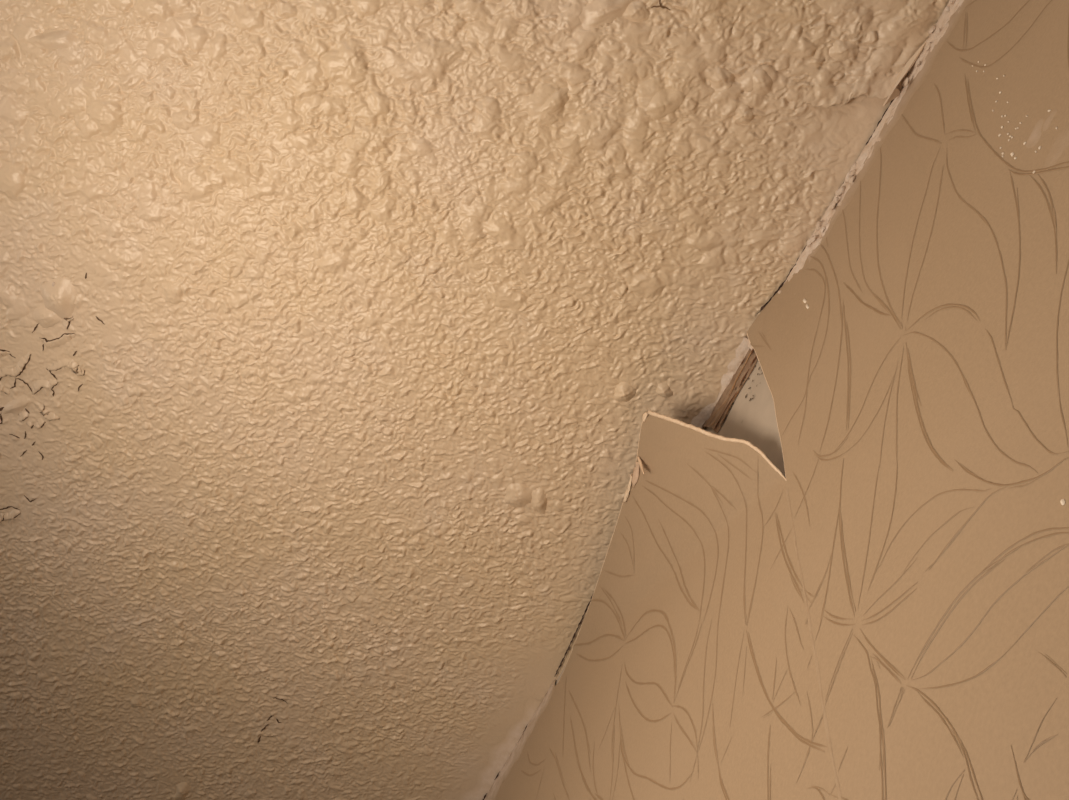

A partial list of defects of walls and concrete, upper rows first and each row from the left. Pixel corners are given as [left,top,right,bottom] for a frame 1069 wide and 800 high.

spalling [778,0,964,294]
crack [0,316,104,460]
spalling [691,337,753,428]
crack [0,495,35,522]